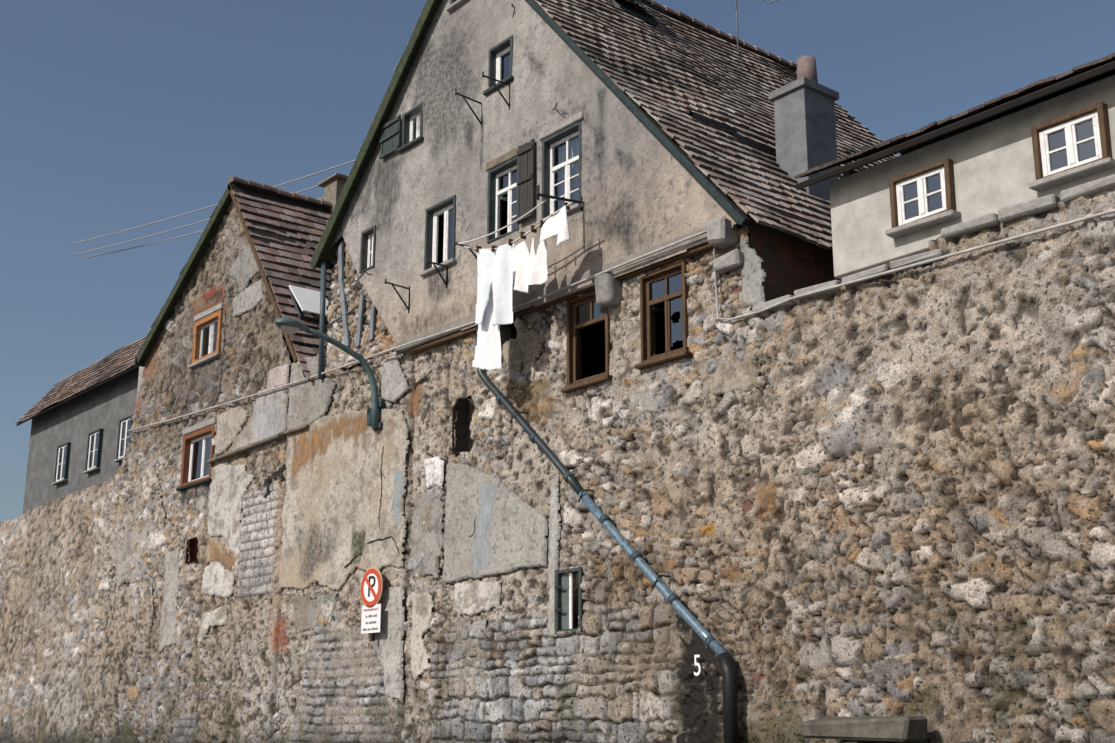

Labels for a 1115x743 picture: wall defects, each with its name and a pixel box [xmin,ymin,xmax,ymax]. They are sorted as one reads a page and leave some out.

flaking render [738,239,766,307]
flaking render [197,238,561,703]
leakage [677,614,723,743]